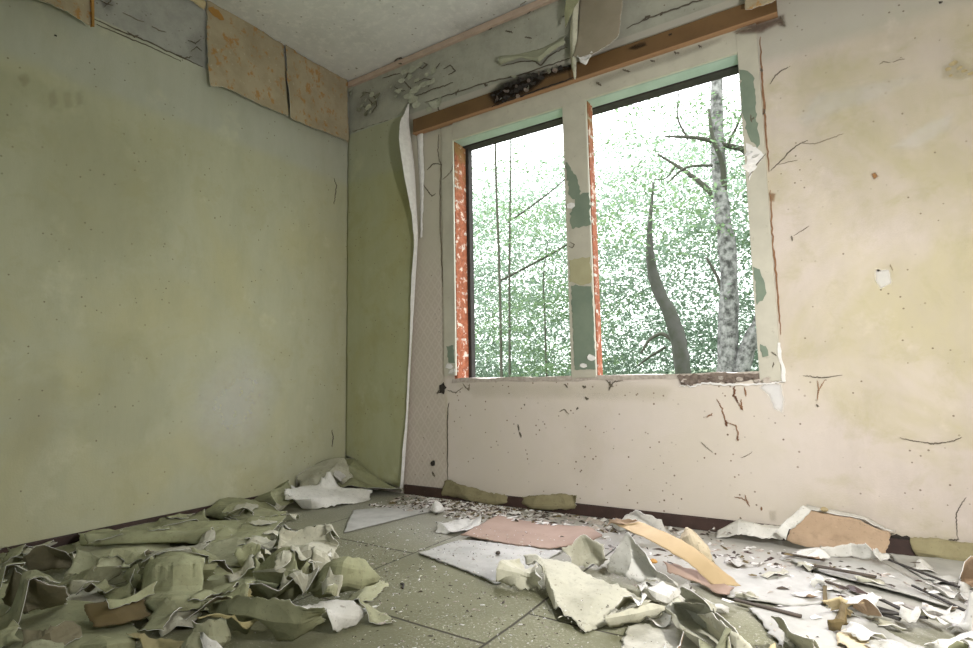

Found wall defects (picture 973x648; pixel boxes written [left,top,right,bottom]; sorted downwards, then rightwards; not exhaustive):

crack [95,19,203,67]
crack [771,133,844,170]
crack [807,375,841,407]